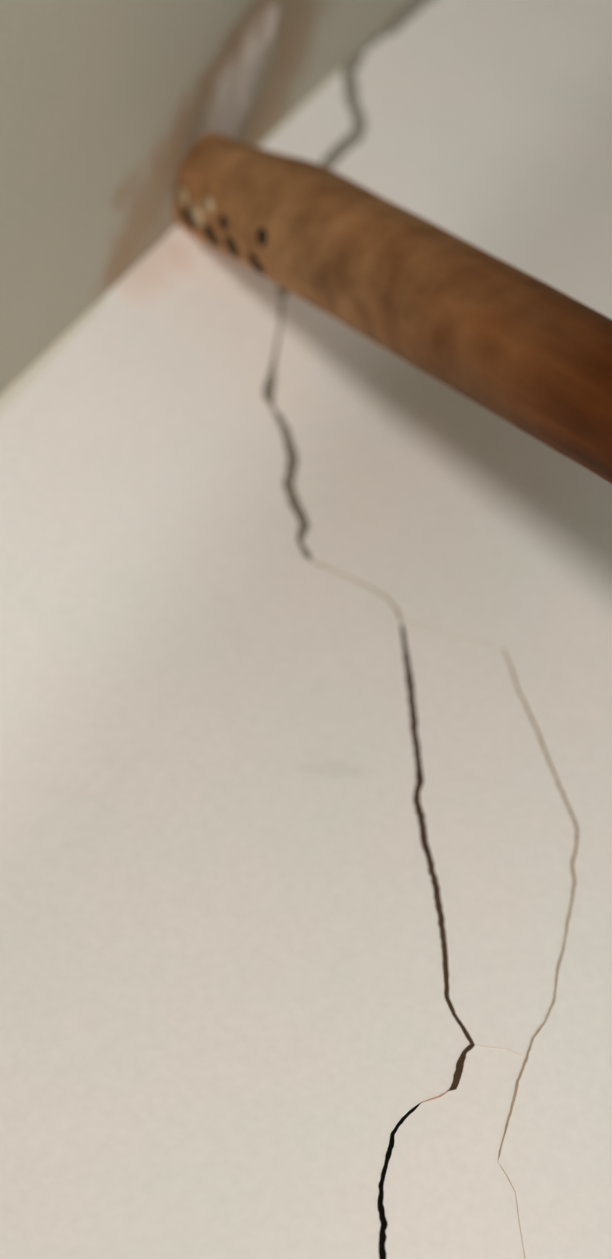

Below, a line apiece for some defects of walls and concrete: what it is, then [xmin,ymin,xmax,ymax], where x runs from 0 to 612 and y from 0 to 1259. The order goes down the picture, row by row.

crack [319,0,430,169]
leakage [103,225,209,320]
crack [263,286,579,1259]